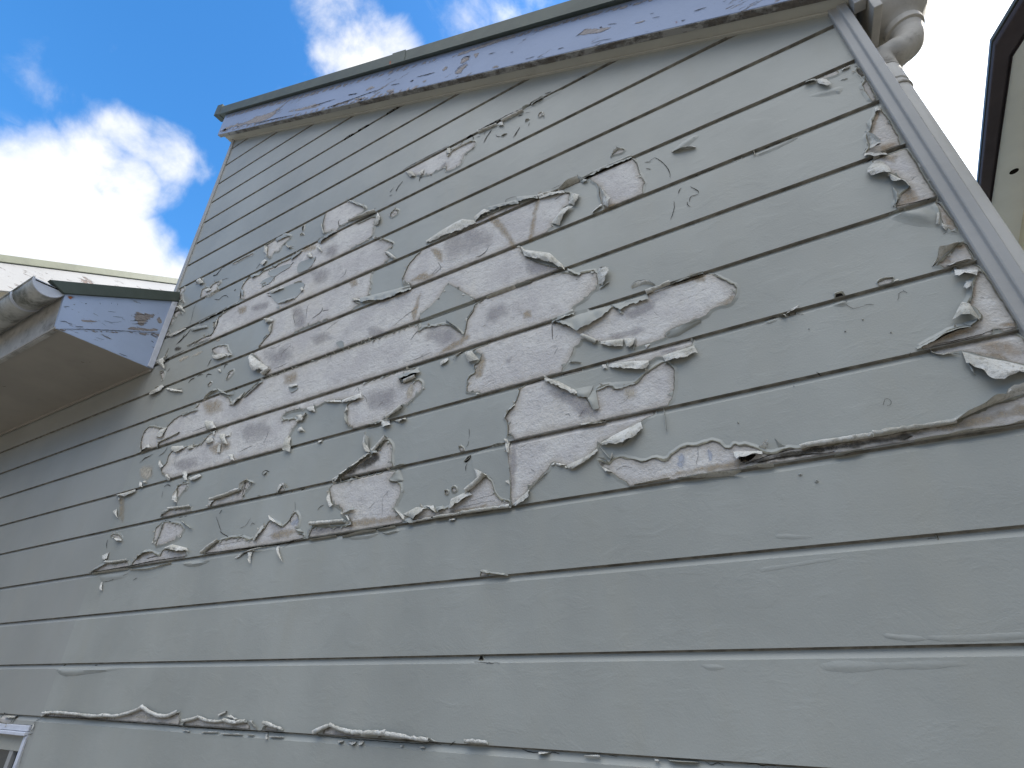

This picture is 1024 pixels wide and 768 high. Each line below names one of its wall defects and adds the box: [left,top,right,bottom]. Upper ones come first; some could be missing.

peeling [220,0,659,132]
peeling [60,64,1024,590]
peeling [0,713,19,727]
peeling [31,704,285,739]
peeling [312,723,488,748]